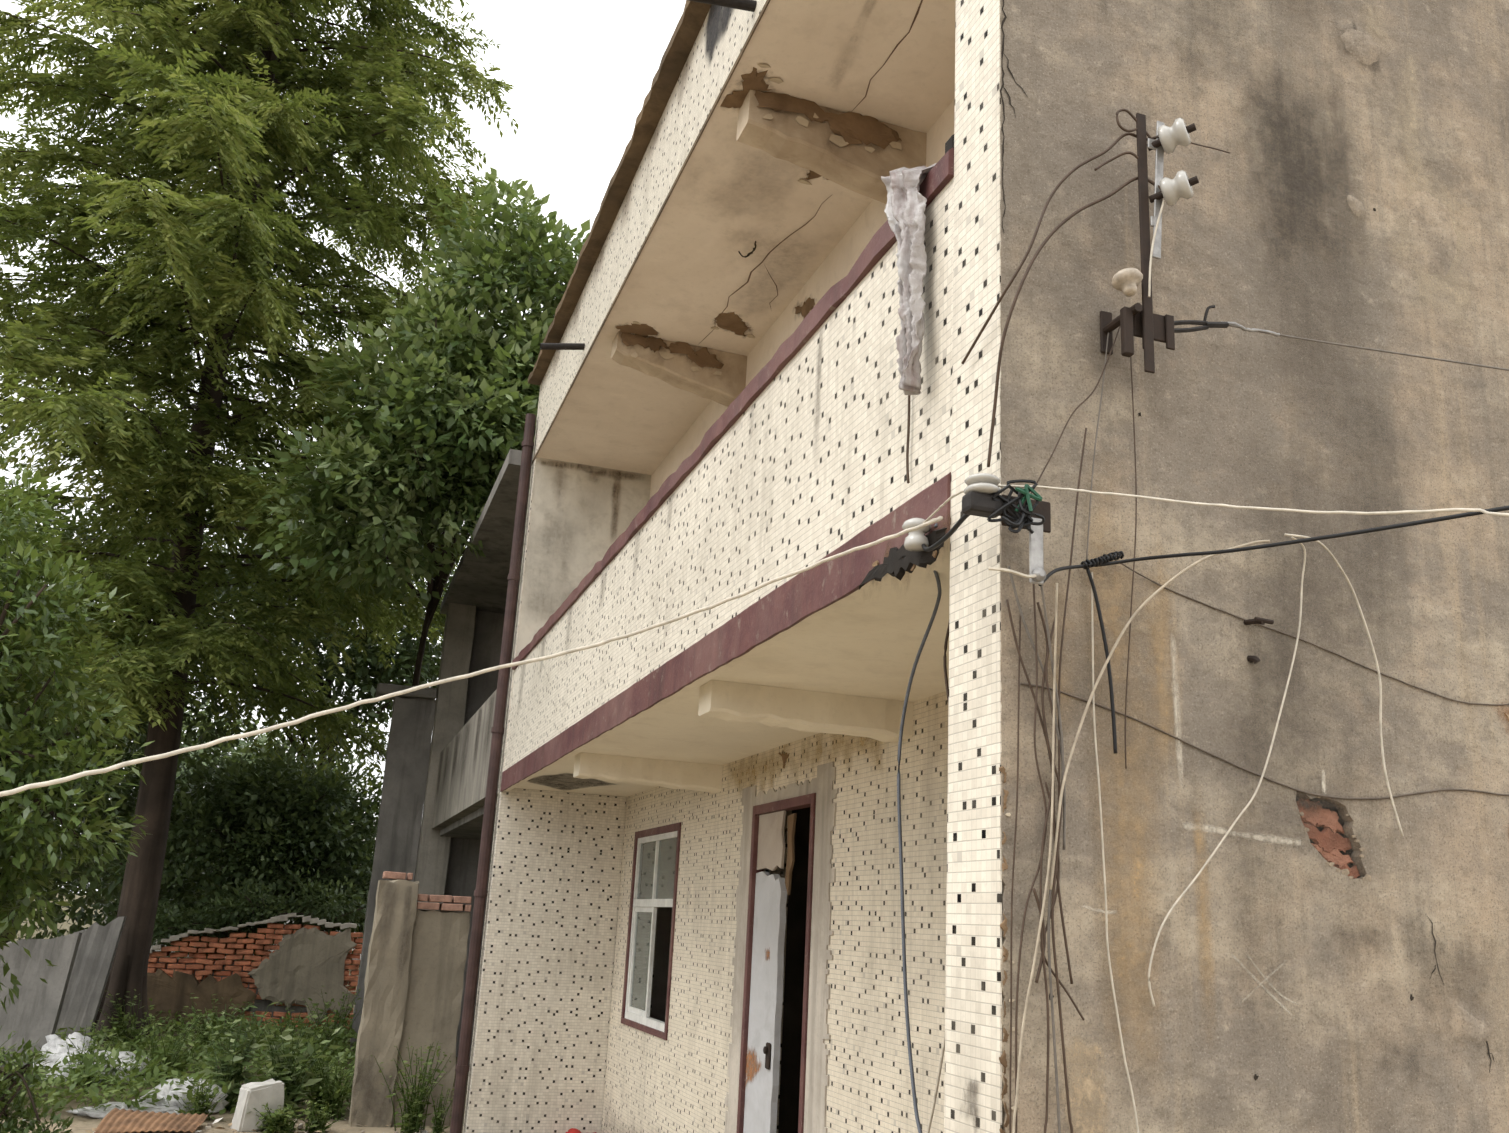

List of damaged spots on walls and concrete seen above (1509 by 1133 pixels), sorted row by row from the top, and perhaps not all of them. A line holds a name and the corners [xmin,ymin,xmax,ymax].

crack [851,0,923,112]
spalling [720,64,902,153]
crack [700,195,832,343]
spalling [615,321,724,375]
spalling [711,312,755,338]
flaking render [1296,789,1371,881]